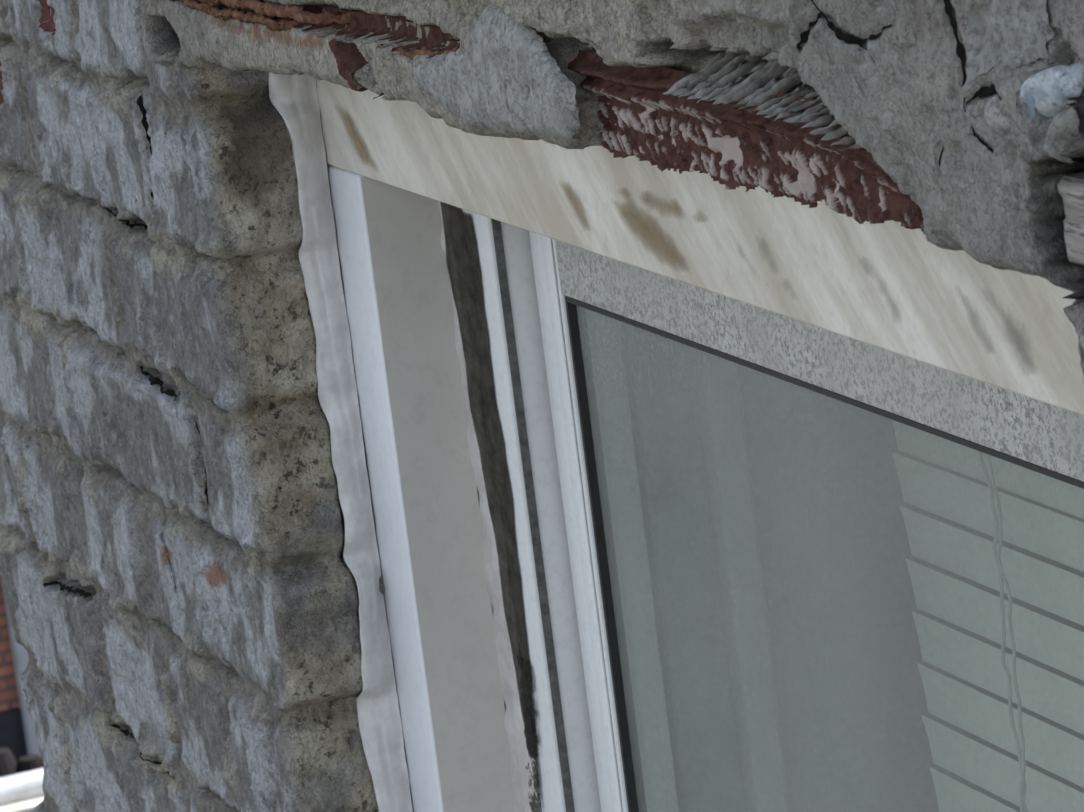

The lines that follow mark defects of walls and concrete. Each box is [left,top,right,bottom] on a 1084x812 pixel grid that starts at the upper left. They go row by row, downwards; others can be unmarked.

crack [136,95,152,155]
corrosion [169,0,460,99]
corrosion [567,50,925,234]
crack [796,0,892,63]
crack [943,0,1001,153]
water stain [440,202,542,812]